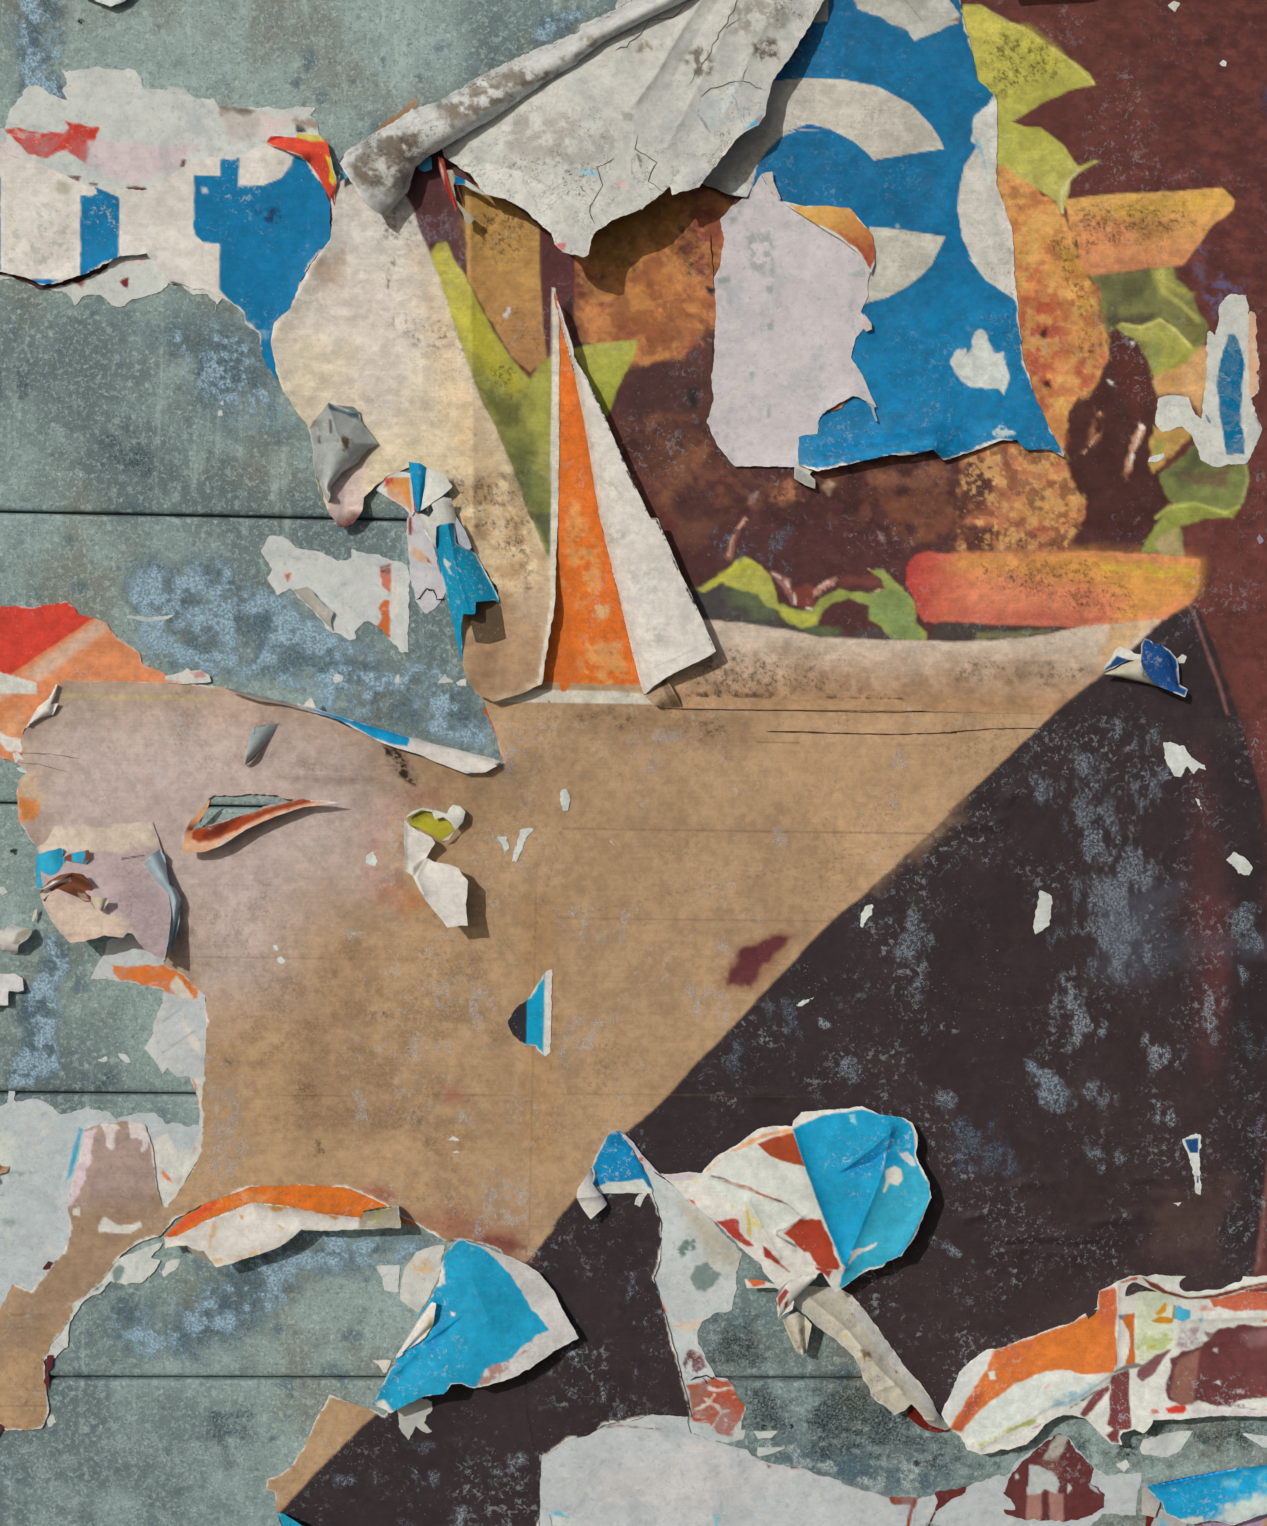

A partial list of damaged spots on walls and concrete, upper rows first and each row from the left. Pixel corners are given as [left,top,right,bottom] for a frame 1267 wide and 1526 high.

peeling [338,0,824,257]
peeling [556,301,716,709]
peeling [225,688,502,773]
peeling [162,1202,401,1277]
peeling [373,1239,578,1413]
peeling [660,1106,1267,1526]